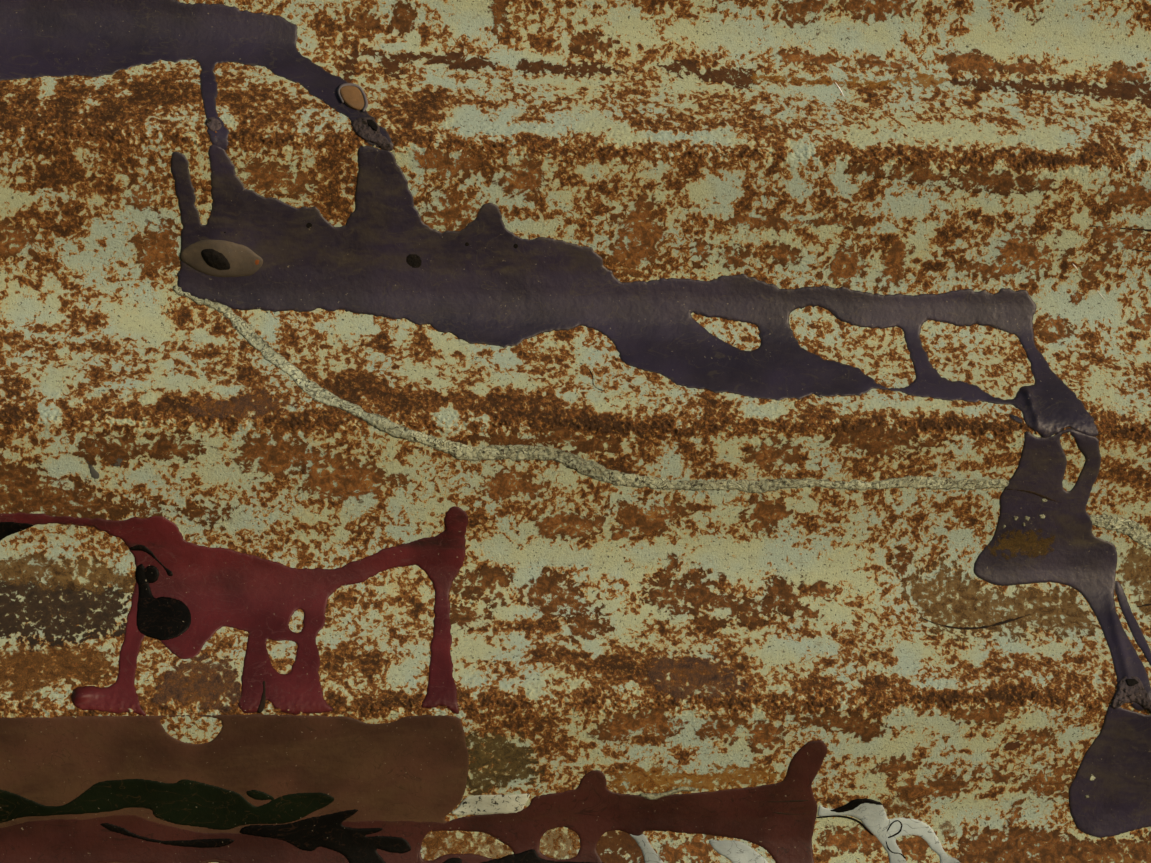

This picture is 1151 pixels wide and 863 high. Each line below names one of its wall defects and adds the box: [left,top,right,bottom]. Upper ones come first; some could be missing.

corrosion [343,47,499,83]
corrosion [516,31,625,78]
corrosion [656,48,1151,108]
corrosion [948,220,1150,305]
corrosion [0,426,246,530]
corrosion [188,389,411,506]
corrosion [0,552,136,703]
corrosion [448,563,615,643]
corrosion [639,553,838,630]
corrosion [889,544,1099,642]
corrosion [587,648,892,794]
corrosion [870,753,1151,863]